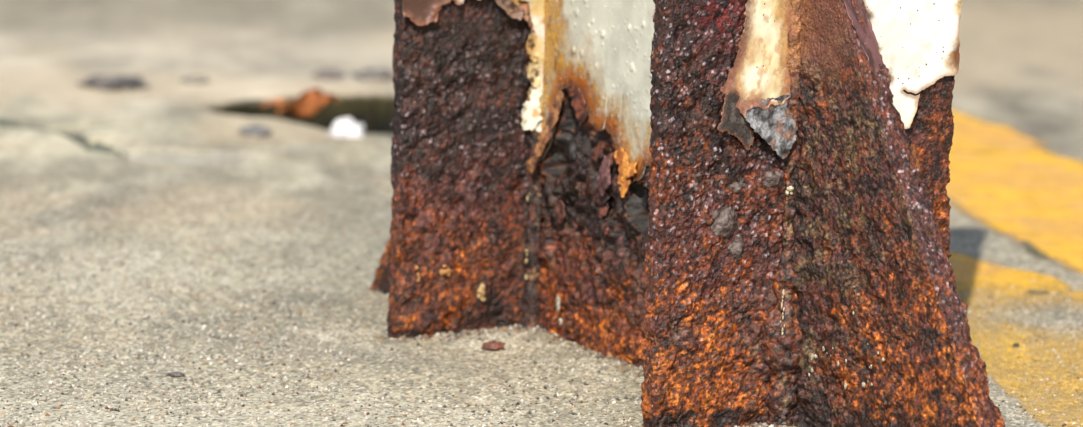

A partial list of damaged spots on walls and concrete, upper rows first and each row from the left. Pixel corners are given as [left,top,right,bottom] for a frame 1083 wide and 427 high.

peeling [402,0,464,26]
peeling [495,0,588,174]
rust [720,0,763,118]
peeling [717,0,798,159]
rust [776,0,802,105]
peeling [841,0,961,129]
rust [947,41,960,72]
peeling [591,143,631,237]